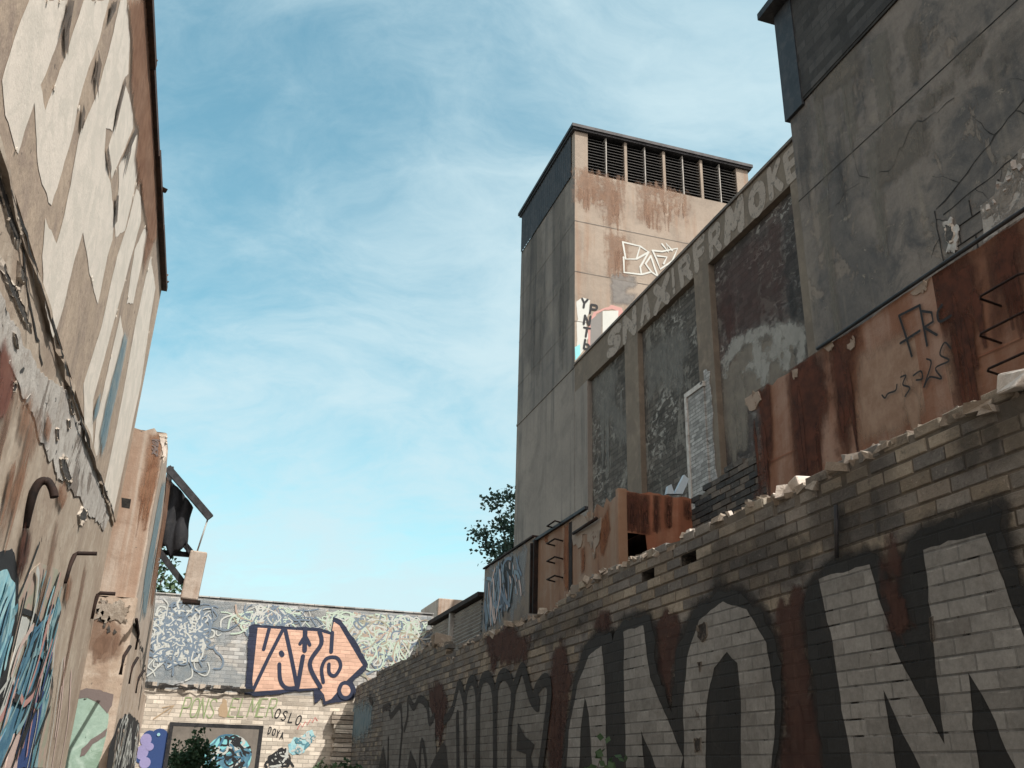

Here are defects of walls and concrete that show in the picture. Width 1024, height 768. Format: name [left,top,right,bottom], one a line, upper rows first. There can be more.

peeling [0,0,155,531]
rust [576,171,628,276]
rust [639,185,686,229]
crack [836,78,1024,261]
flaking render [942,217,960,254]
spalling [982,153,1024,212]
flaking render [703,369,718,482]
rust [753,383,772,496]
rust [788,327,858,476]
spalling [94,598,131,623]
rust [627,492,691,534]
spalling [681,550,697,566]